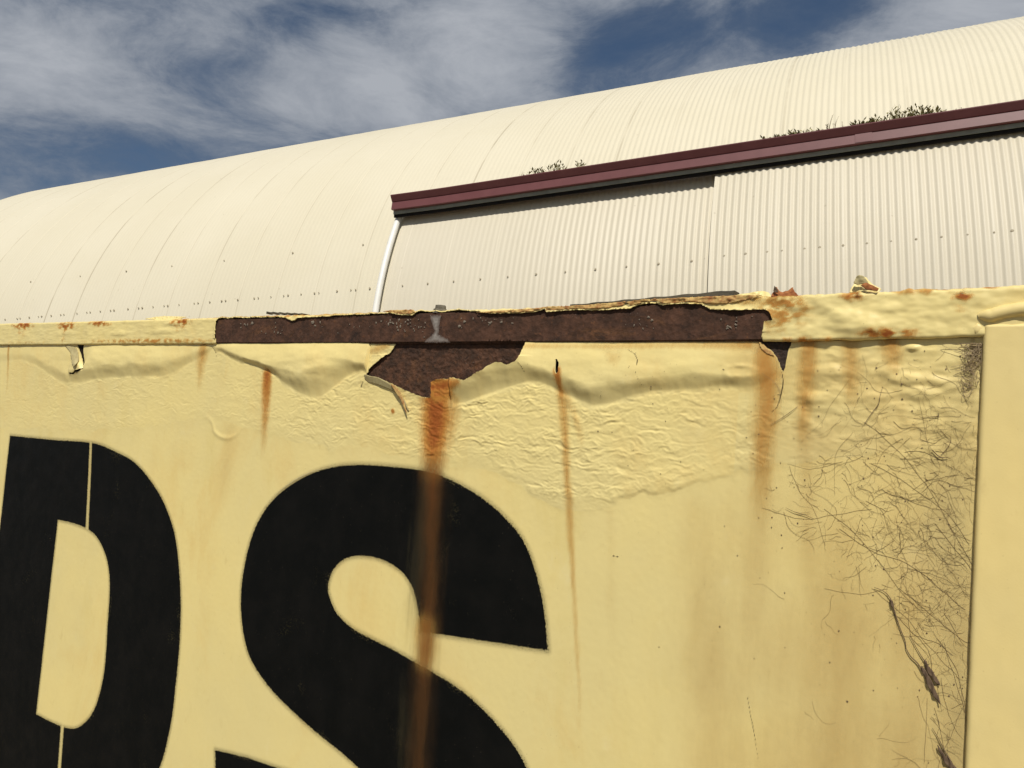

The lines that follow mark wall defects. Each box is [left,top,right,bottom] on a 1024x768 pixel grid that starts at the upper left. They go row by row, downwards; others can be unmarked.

rust [262,370,271,412]
rust [422,378,459,473]
peeling [215,286,798,413]
rust [554,367,567,452]
rust [743,342,777,466]
rust [767,296,808,325]
rust [419,619,433,667]